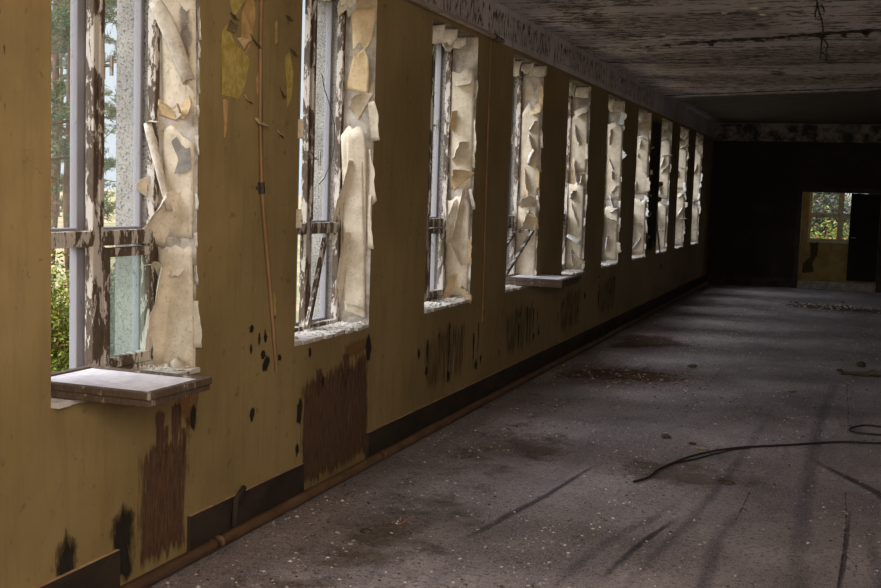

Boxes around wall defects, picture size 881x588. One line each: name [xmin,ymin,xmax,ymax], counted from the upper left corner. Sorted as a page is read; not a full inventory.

crack [814,0,829,61]
peeling [135,0,202,370]
peeling [321,0,380,318]
peeling [428,0,550,304]
peeling [566,82,590,269]
peeling [603,97,703,260]
water stain [113,506,134,580]